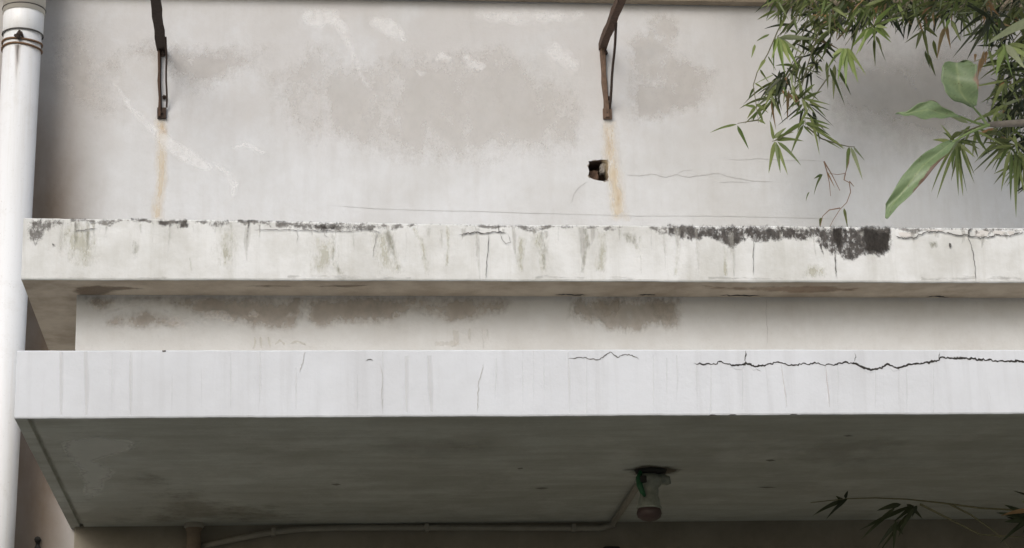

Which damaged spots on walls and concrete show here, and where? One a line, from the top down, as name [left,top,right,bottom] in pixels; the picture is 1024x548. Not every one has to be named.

hole [587,159,609,182]
rust [608,130,623,215]
damp [29,218,415,249]
damp [477,224,569,270]
damp [649,224,932,262]
damp [75,286,139,309]
damp [108,311,179,328]
damp [158,285,504,328]
damp [574,298,678,331]
crack [695,240,1024,373]
crack [569,352,637,360]